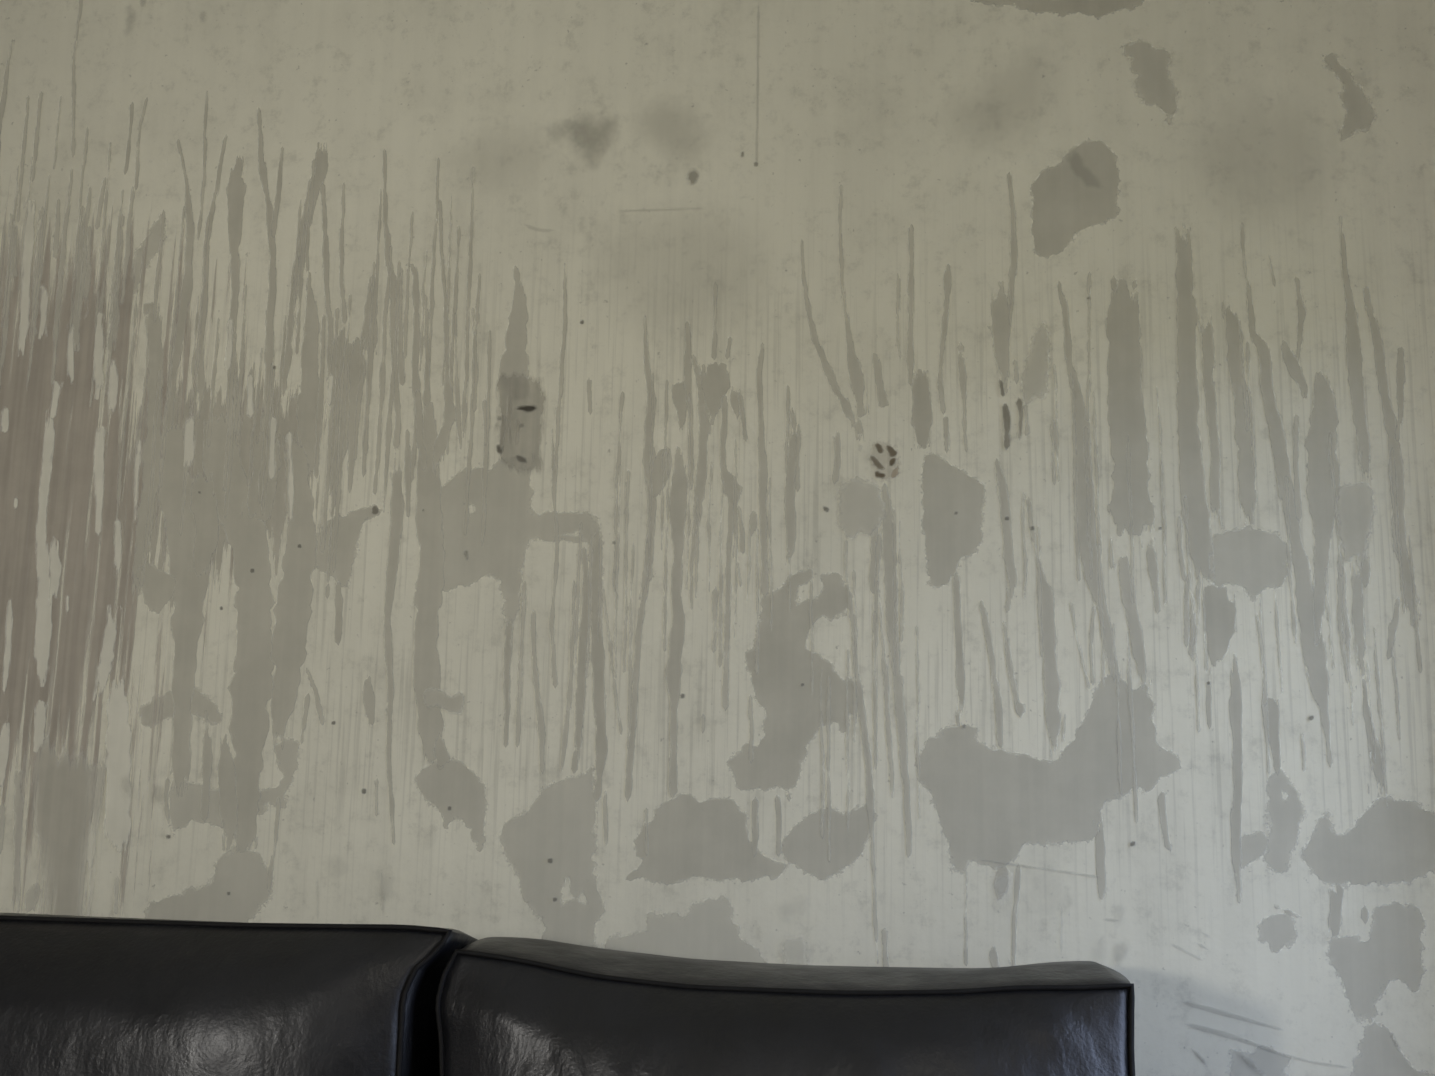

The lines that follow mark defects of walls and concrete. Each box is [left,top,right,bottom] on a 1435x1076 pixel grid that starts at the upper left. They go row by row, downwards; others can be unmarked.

peeling [971,0,1143,19]
peeling [1125,40,1177,123]
peeling [1325,53,1375,140]
peeling [1031,139,1120,258]
peeling [298,505,380,645]
peeling [139,689,221,727]
peeling [415,397,877,963]
peeling [870,369,1181,967]
peeling [257,738,299,815]
peeling [1203,526,1435,1076]
peeling [145,846,273,923]